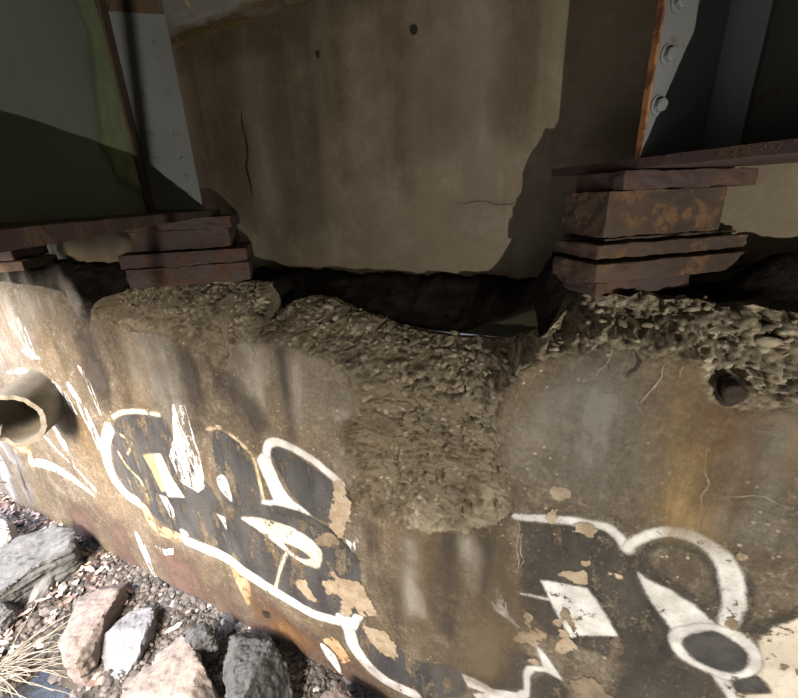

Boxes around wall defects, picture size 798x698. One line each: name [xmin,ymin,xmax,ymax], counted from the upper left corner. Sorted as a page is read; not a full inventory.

leakage [0,289,52,370]
spalling [91,279,798,547]
leakage [0,441,17,503]
peeling [296,579,317,602]
peeling [322,571,398,664]